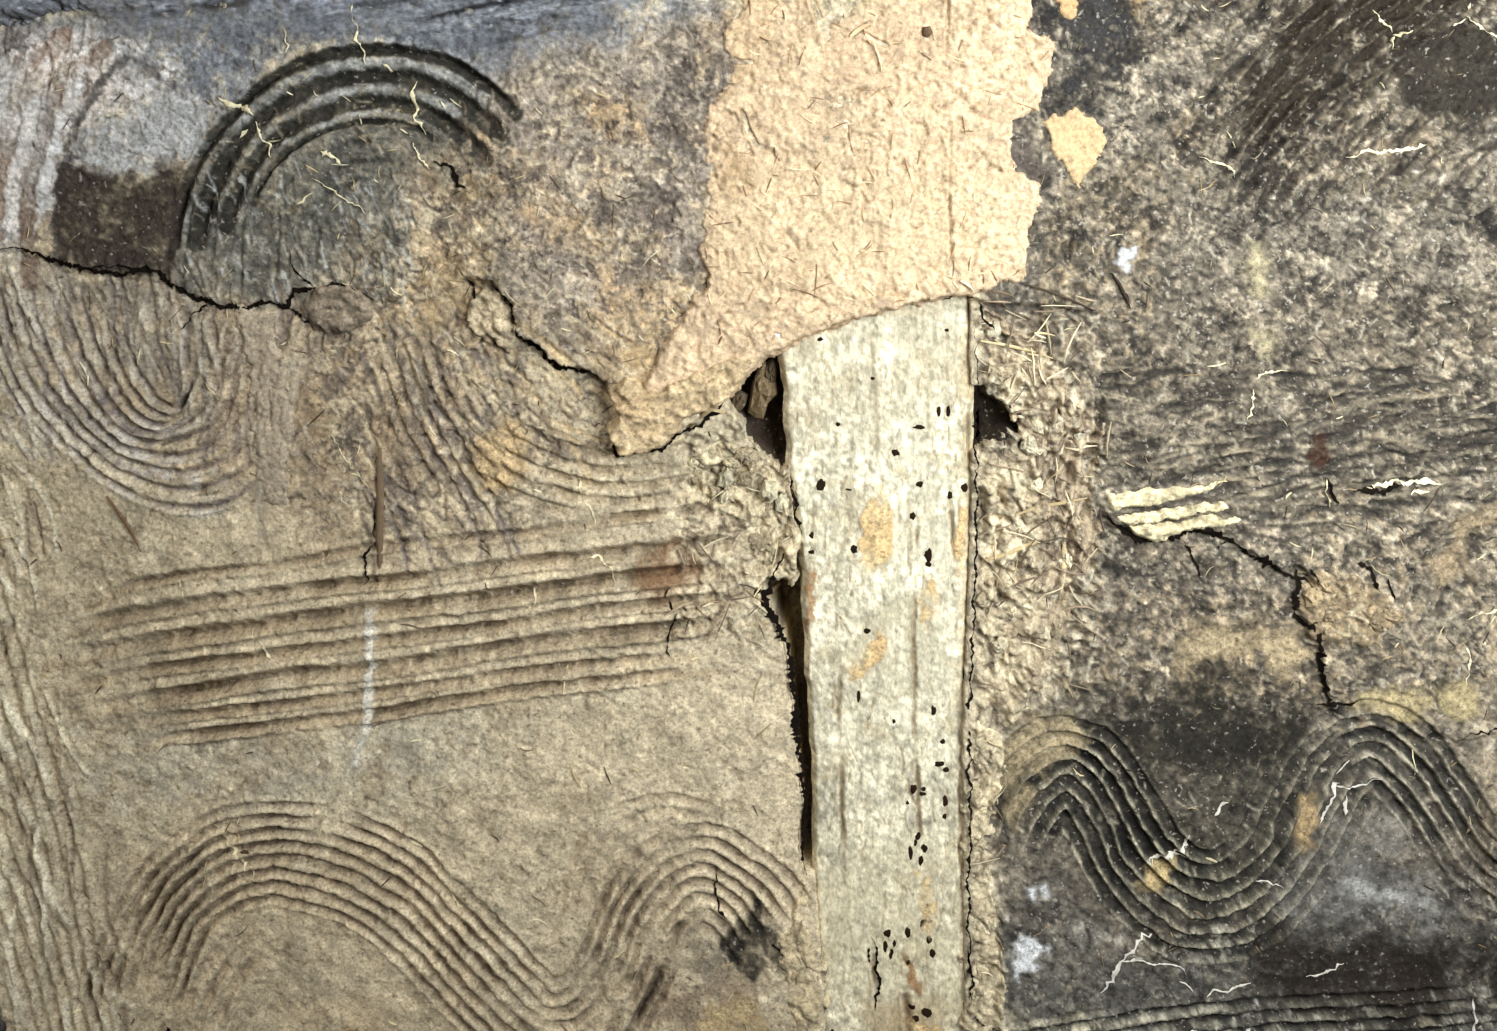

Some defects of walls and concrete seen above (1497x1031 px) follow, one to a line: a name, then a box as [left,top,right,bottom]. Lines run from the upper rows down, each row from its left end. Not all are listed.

crack [1,247,374,333]
crack [466,277,600,380]
crack [754,477,810,875]
crack [1107,513,1363,710]
crack [1356,562,1395,599]
crack [1460,609,1497,685]
spalling [777,861,830,1031]